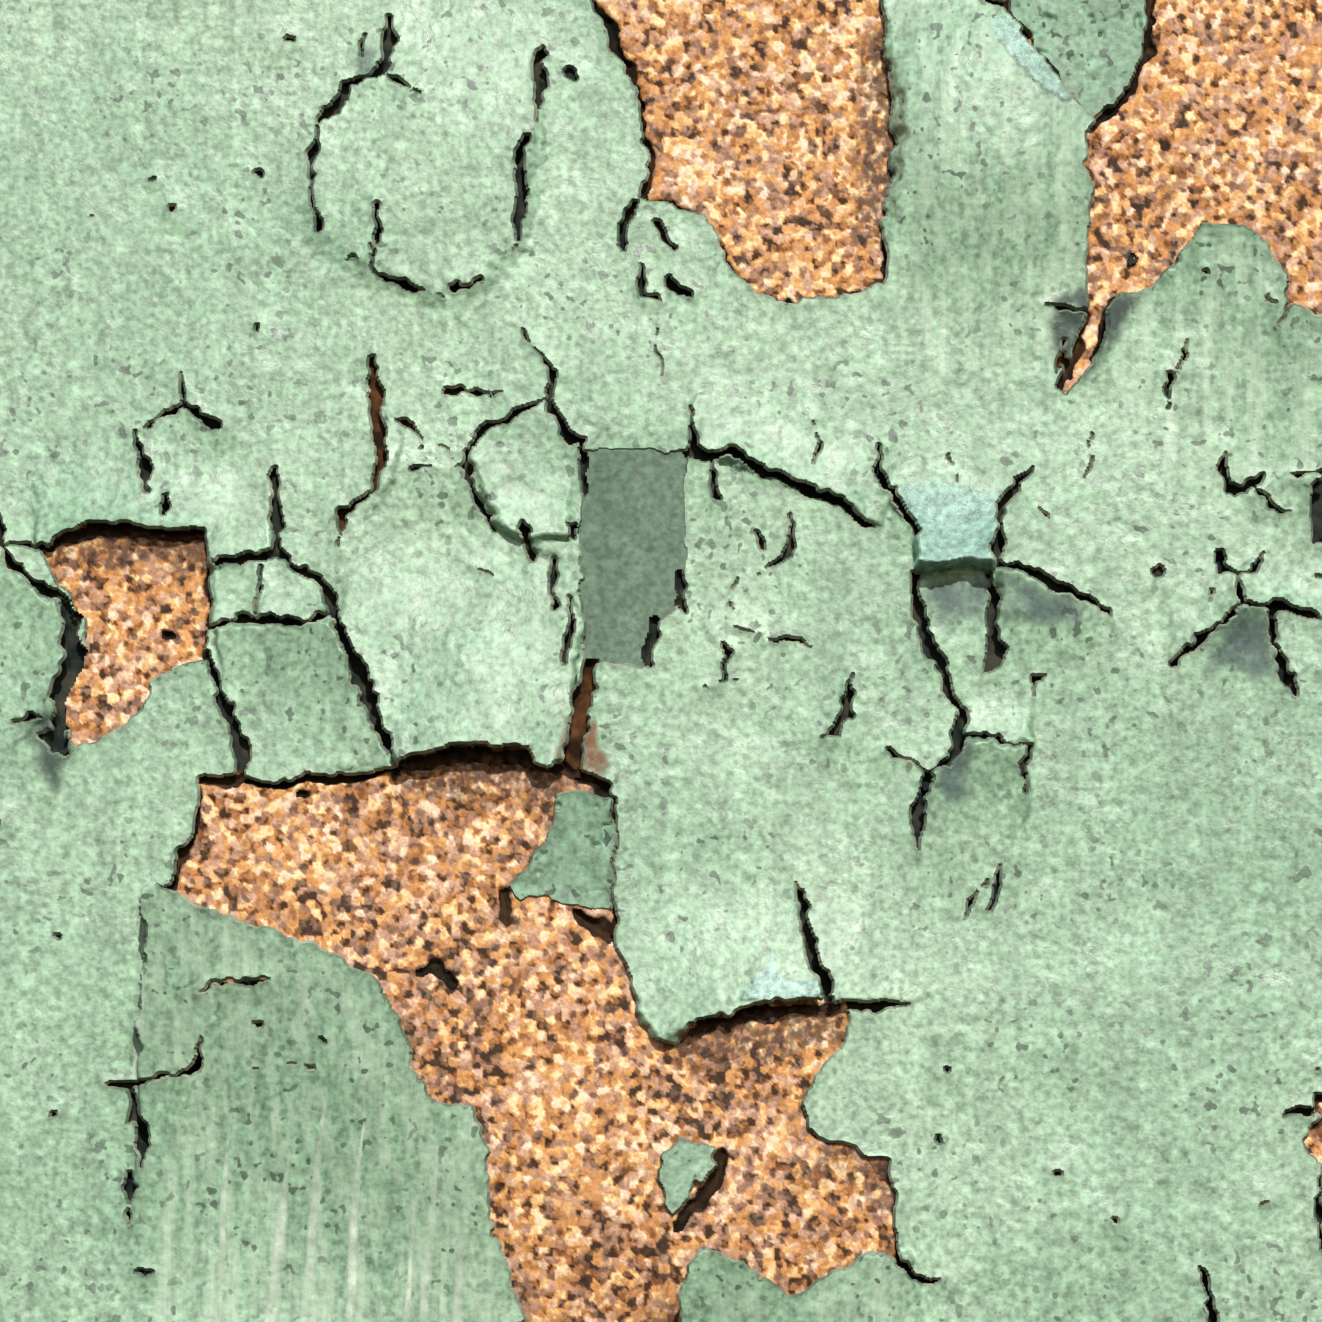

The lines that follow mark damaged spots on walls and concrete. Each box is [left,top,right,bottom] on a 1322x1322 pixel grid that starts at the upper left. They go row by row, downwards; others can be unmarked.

peeling [592,0,896,304]
peeling [992,0,1322,394]
crack [207,468,392,771]
crack [337,356,422,546]
crack [444,331,601,769]
peeling [33,357,1121,1322]
crack [682,410,920,567]
crack [887,573,1031,850]
crack [984,470,1110,672]
crack [1169,551,1317,696]
peeling [1167,472,1322,739]
peeling [1304,1094,1322,1164]